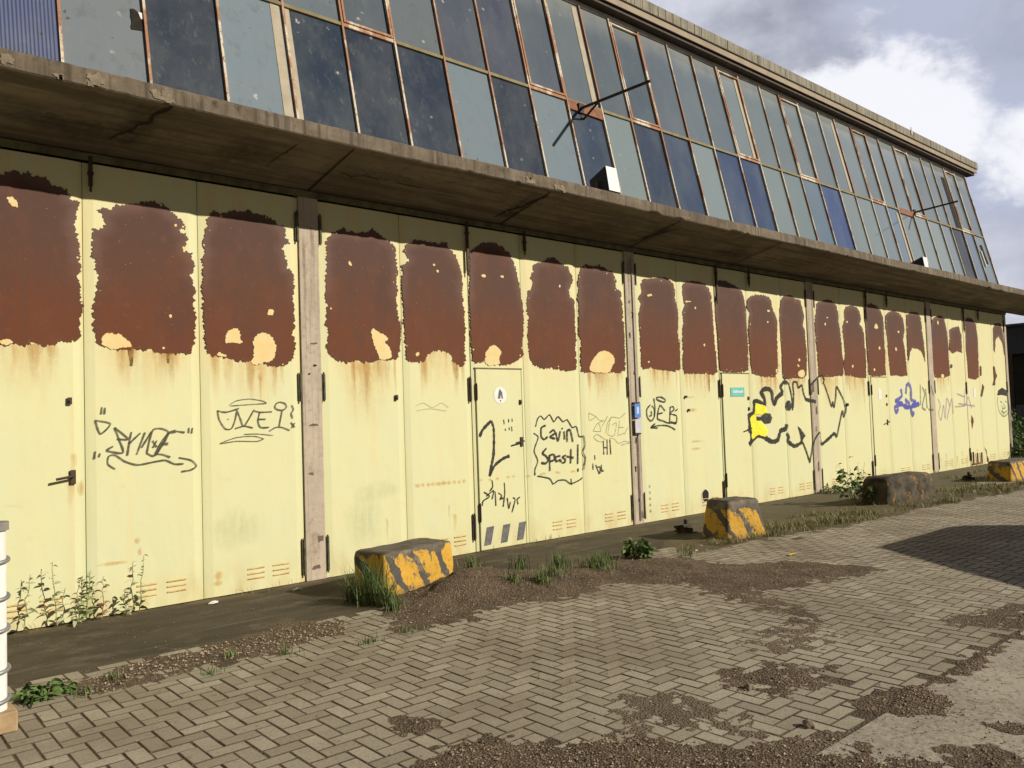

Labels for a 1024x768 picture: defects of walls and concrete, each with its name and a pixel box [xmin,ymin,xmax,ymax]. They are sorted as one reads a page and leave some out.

crack [110,106,176,139]